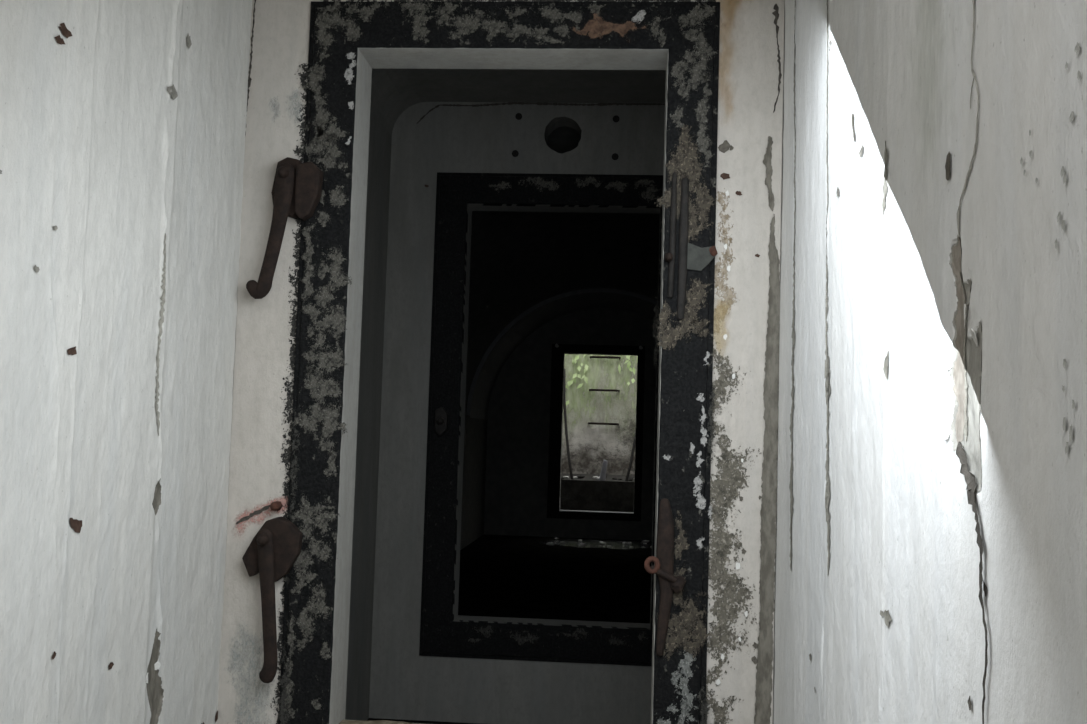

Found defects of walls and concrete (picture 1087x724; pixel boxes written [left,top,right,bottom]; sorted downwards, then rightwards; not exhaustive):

peeling [277,0,384,724]
peeling [398,0,780,724]
crack [772,0,796,570]
crack [823,0,831,575]
spalling [941,235,982,491]
crack [957,0,979,235]
crack [956,442,988,724]